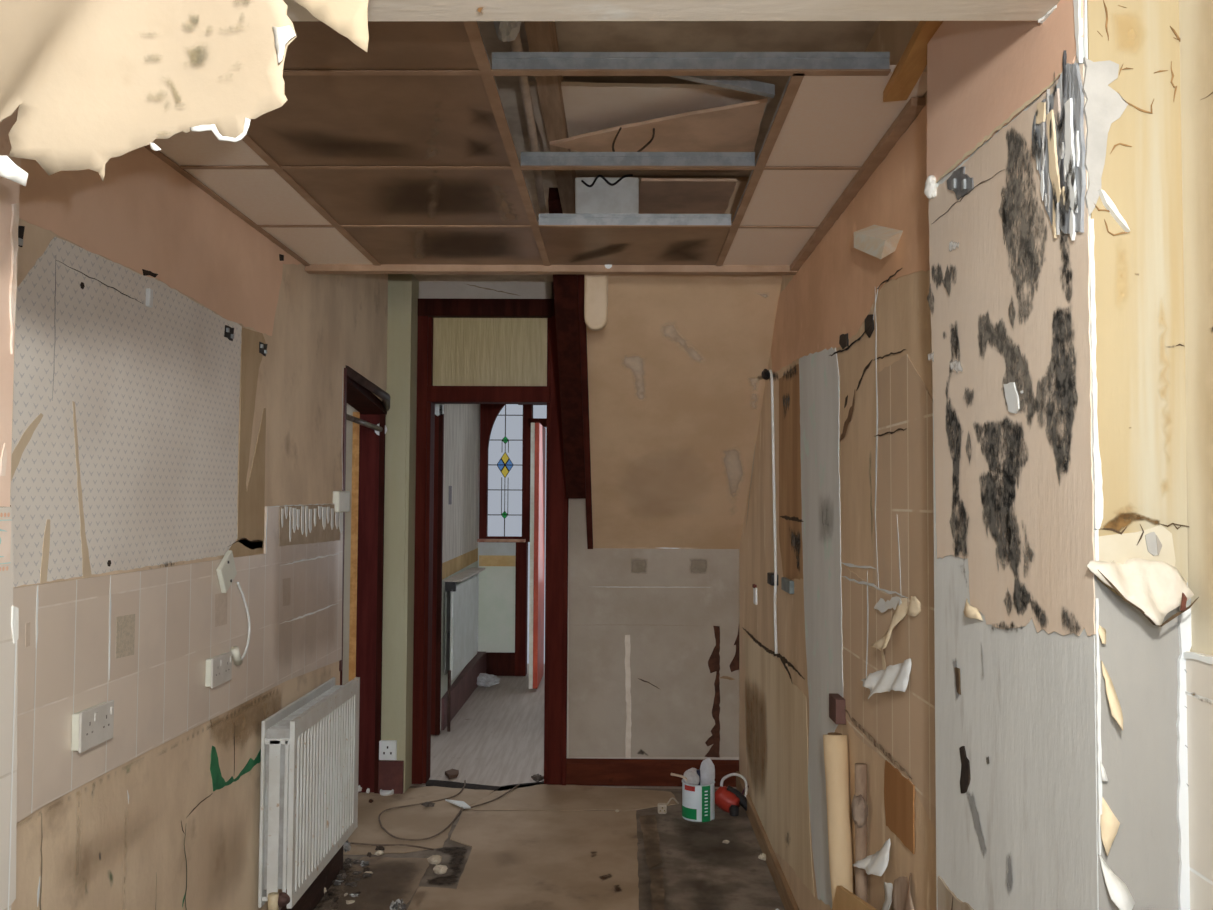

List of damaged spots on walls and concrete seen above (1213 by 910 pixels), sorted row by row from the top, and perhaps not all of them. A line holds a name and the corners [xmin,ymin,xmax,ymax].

spalling [1032,0,1130,240]
water stain [433,236,502,254]
crack [1093,202,1130,236]
water stain [927,264,956,313]
water stain [943,129,1078,630]
peeling [222,325,268,559]
spalling [1099,525,1176,567]
water stain [1062,609,1080,632]
crack [742,627,804,684]
spalling [704,626,739,758]